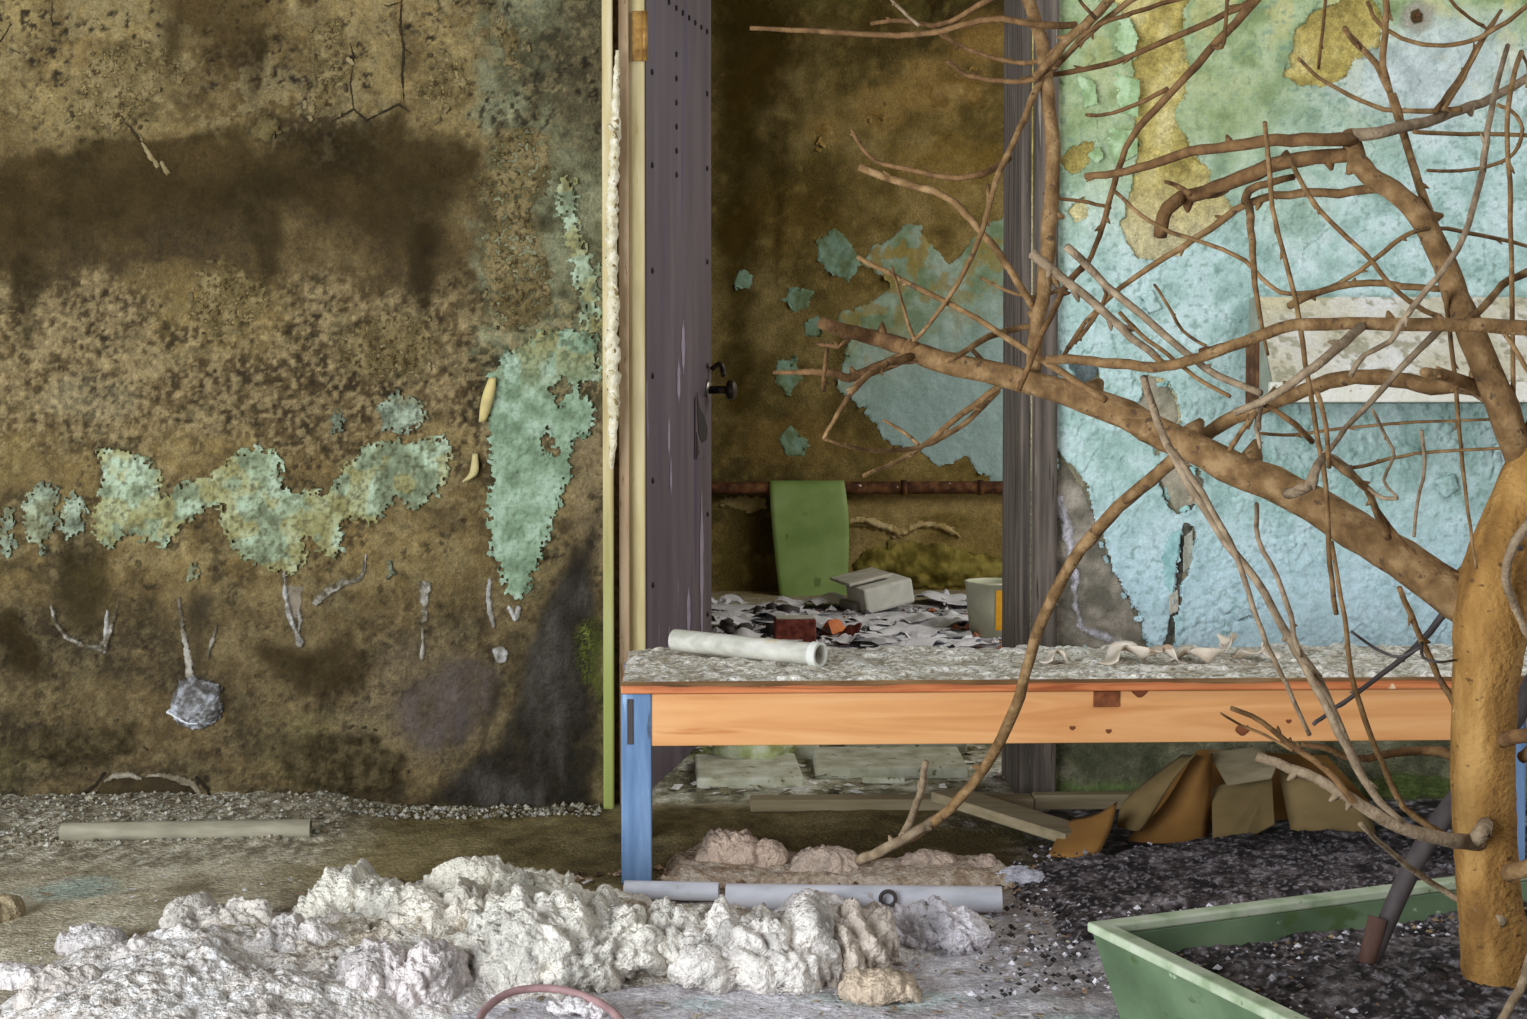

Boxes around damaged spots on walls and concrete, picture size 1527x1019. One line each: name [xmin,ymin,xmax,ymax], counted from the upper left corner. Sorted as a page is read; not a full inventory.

crack [331,0,412,123]
damp [0,122,479,244]
peeling [733,269,753,290]
peeling [779,287,823,337]
peeling [816,218,1003,481]
peeling [1058,0,1527,570]
peeling [0,308,455,576]
peeling [1039,404,1452,665]
damp [50,604,117,653]
damp [261,555,367,692]
damp [418,580,431,661]
damp [432,537,592,807]